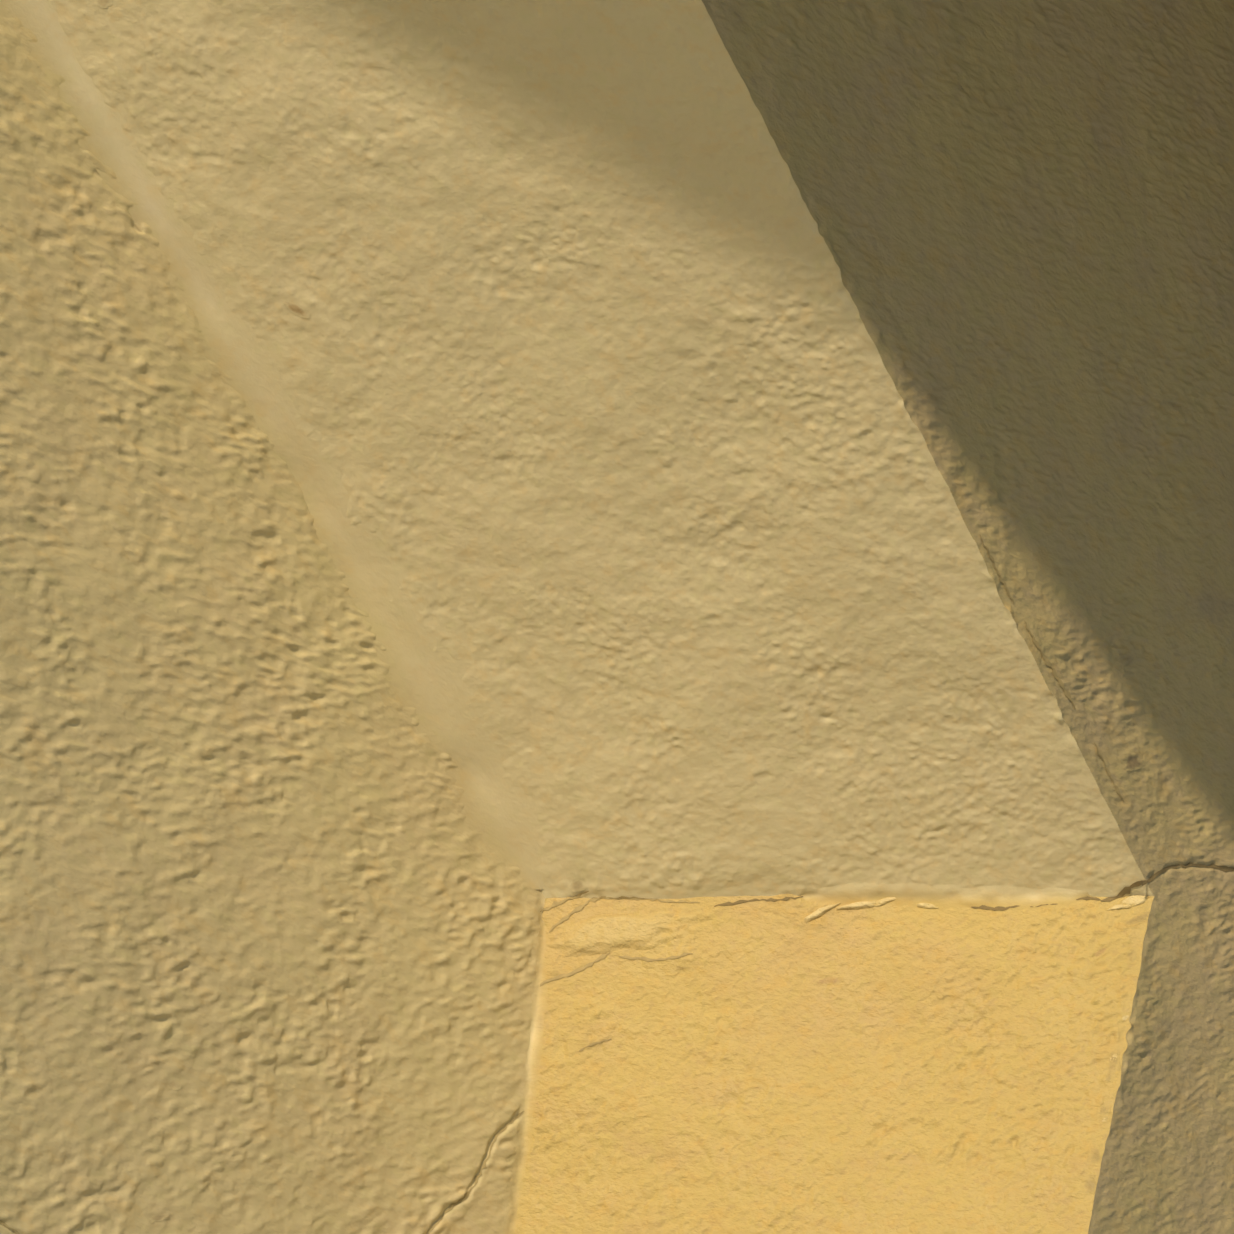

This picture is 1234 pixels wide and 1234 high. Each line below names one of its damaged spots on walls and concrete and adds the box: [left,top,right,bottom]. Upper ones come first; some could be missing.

crack [972,863,1234,911]
crack [540,891,803,933]
crack [428,1111,525,1234]